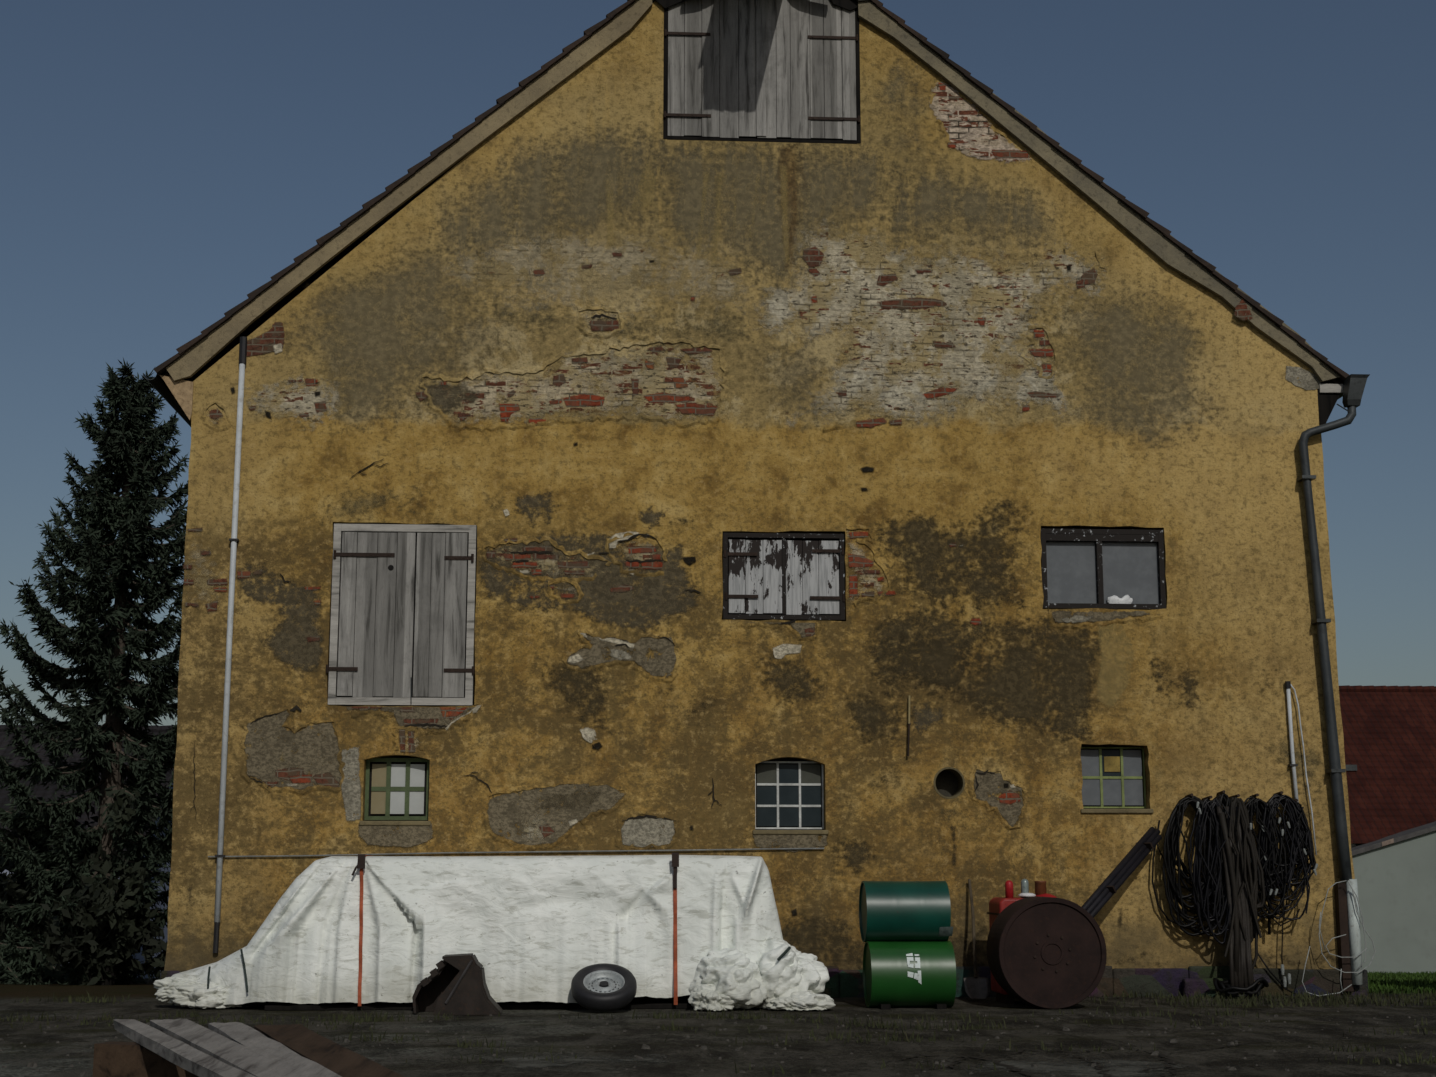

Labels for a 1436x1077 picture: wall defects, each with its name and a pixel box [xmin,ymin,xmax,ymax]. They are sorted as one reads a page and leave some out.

peeling [928,82,1031,163]
leakage [893,171,1051,246]
spalling [247,322,285,357]
spalling [416,304,729,432]
leakage [290,129,878,420]
peeling [755,220,1105,434]
leakage [1054,292,1202,442]
peeling [561,627,682,684]
leakage [847,500,1101,742]
peeling [481,778,693,855]